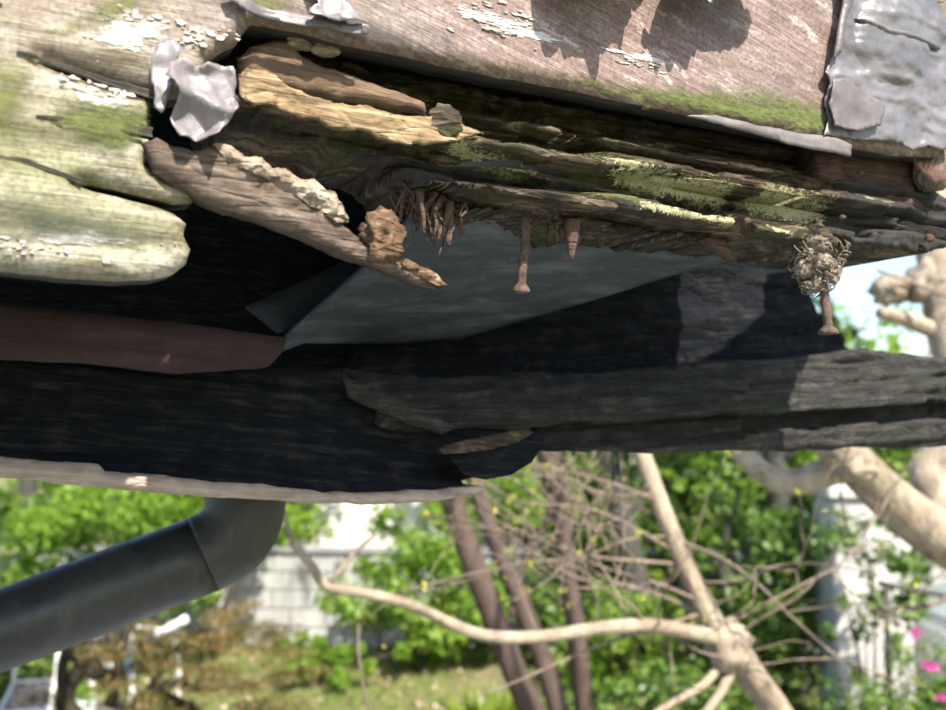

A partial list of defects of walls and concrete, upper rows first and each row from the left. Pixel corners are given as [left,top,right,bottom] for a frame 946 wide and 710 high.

crack [17,51,155,99]
crack [36,114,65,122]
damp [55,104,145,154]
damp [592,80,828,134]
crack [0,155,83,184]